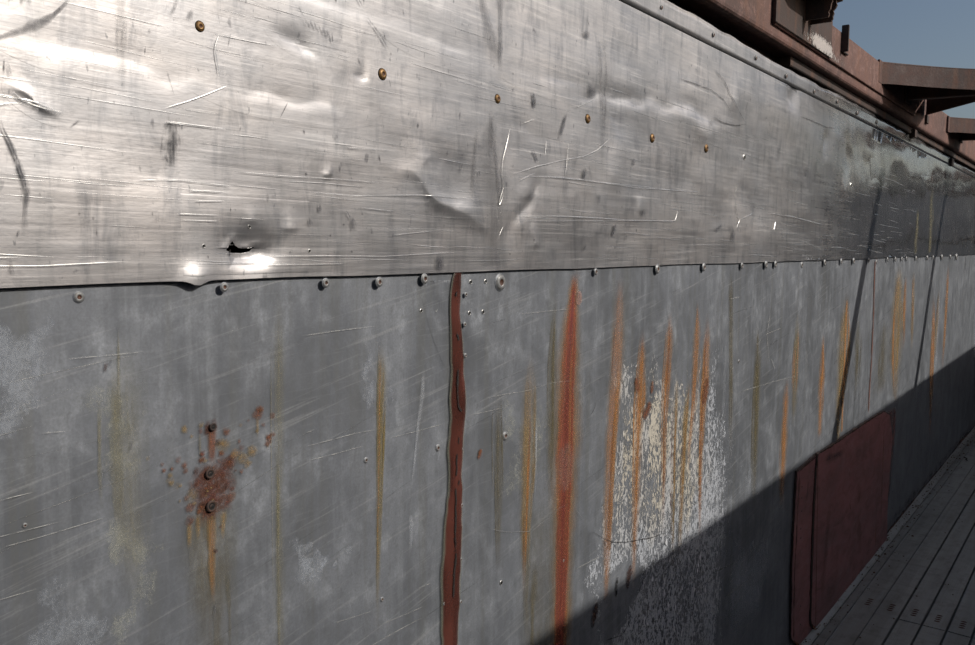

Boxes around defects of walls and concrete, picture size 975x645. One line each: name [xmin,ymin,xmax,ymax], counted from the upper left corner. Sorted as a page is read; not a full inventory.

rust [163,423,255,583]
rust [556,287,582,645]
rust [633,350,709,485]
rust [800,303,883,471]